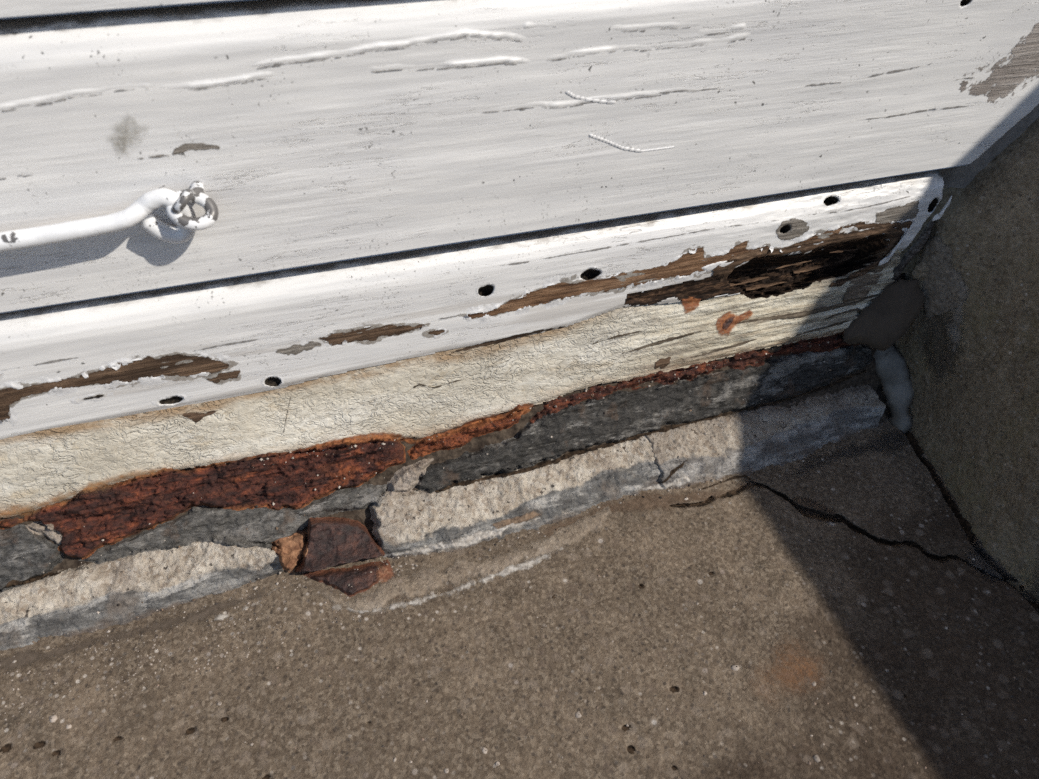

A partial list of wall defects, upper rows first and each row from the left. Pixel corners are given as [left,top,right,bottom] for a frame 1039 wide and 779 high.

peeling [959,23,1039,103]
spalling [140,143,220,160]
peeling [932,196,952,221]
spalling [458,201,919,325]
peeling [276,321,449,355]
corrosion [716,310,752,335]
peeling [0,350,241,426]
corrosion [0,332,863,560]
crack [659,411,1039,613]
corrosion [272,528,309,573]